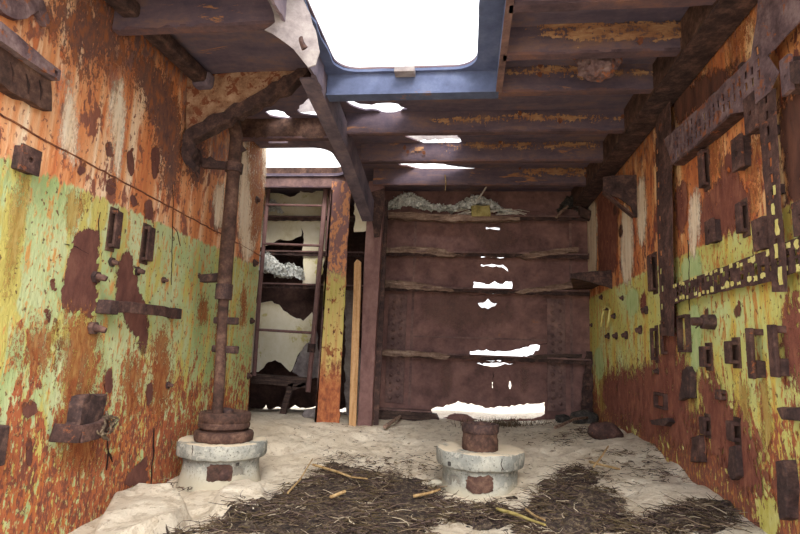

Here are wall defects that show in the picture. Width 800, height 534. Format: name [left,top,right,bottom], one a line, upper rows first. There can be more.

corrosion [24,0,210,220]
corrosion [0,176,30,299]
corrosion [63,188,89,238]
peeling [61,227,101,319]
corrosion [1,298,178,429]
peeling [115,251,145,304]
peeling [123,313,151,355]
corrosion [195,293,218,368]
corrosion [239,283,249,330]